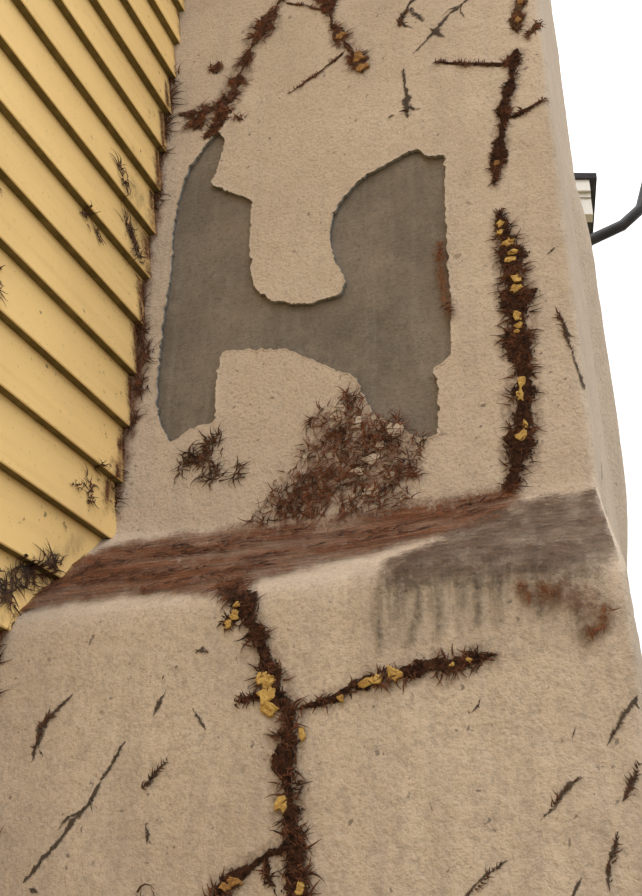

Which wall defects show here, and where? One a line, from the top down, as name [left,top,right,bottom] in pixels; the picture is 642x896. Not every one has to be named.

crack [178,0,372,139]
crack [388,0,549,187]
spalling [154,130,454,530]
crack [485,208,585,497]
rust [13,479,531,617]
damp [377,489,616,638]
rust [516,580,621,639]
crack [202,574,497,896]
crack [465,859,509,896]
crack [572,878,582,896]
crack [605,832,623,890]